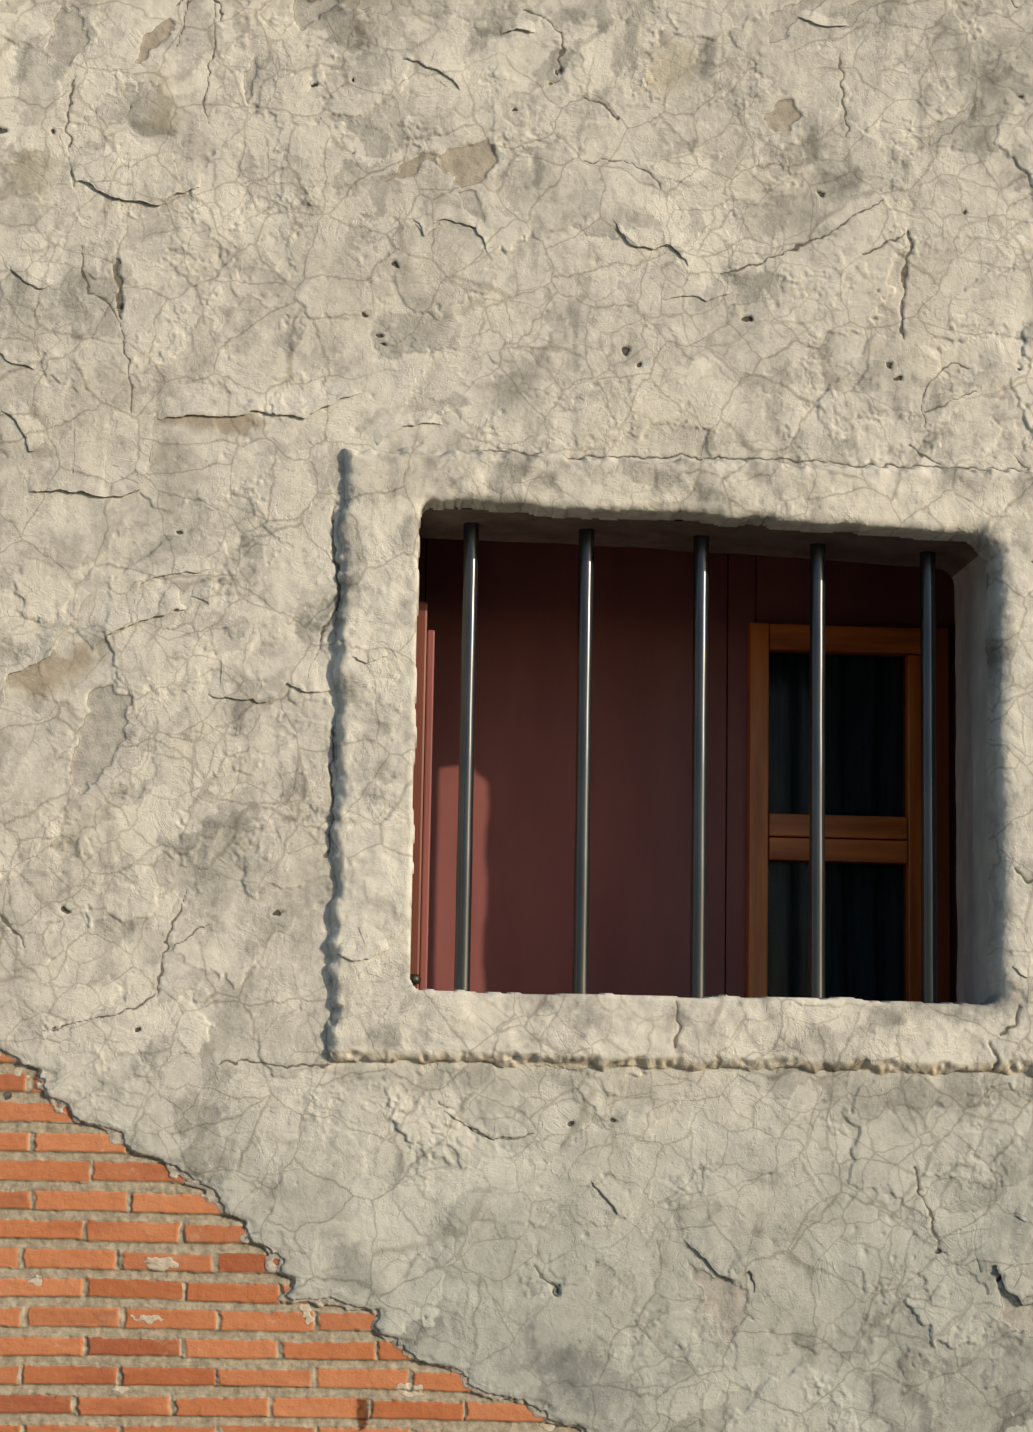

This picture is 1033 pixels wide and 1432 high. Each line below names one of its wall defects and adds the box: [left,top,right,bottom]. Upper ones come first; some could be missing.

spalling [135,18,175,64]
spalling [764,99,801,132]
spalling [381,137,498,253]
crack [81,247,133,412]
crack [862,230,913,339]
crack [470,363,1029,472]
crack [318,508,341,650]
crack [324,727,335,858]
crack [44,891,210,1031]
spalling [0,1050,586,1432]
flaking render [684,1220,783,1343]
corrosion [357,1399,369,1430]